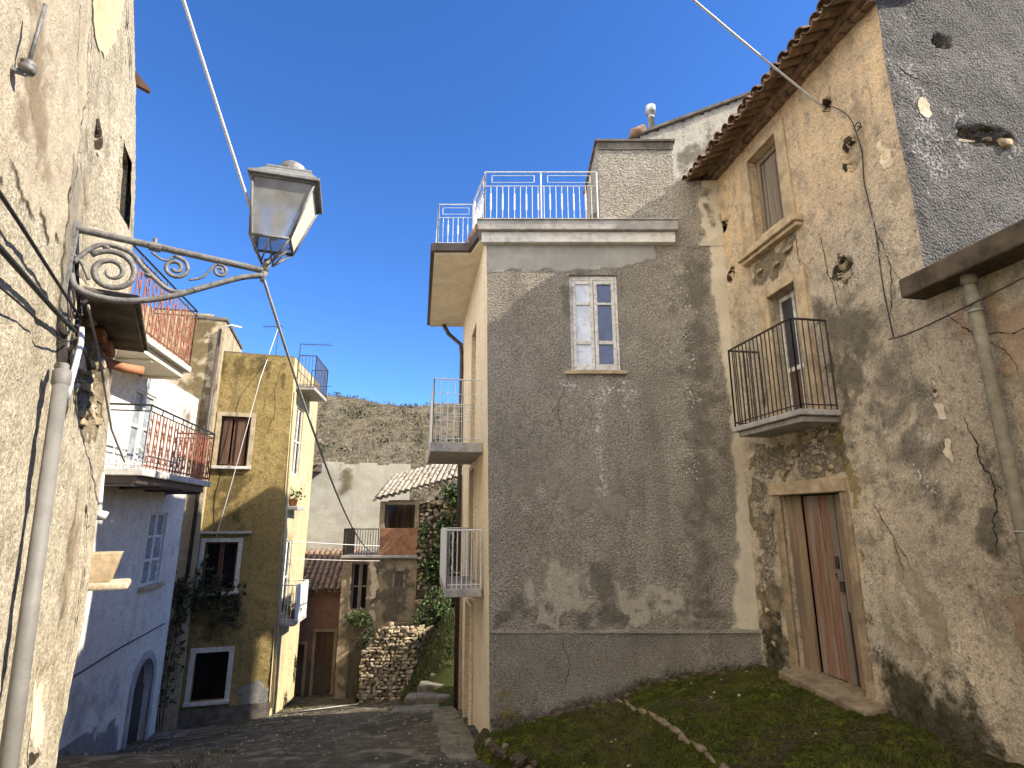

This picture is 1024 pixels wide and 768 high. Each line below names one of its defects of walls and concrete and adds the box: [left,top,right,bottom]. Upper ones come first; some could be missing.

hole [842,136,861,172]
peeling [885,53,1023,194]
crack [795,234,841,313]
hole [832,253,853,285]
crack [945,312,1024,375]
crack [962,415,1007,557]
flaking render [748,424,849,666]
crack [872,501,910,575]